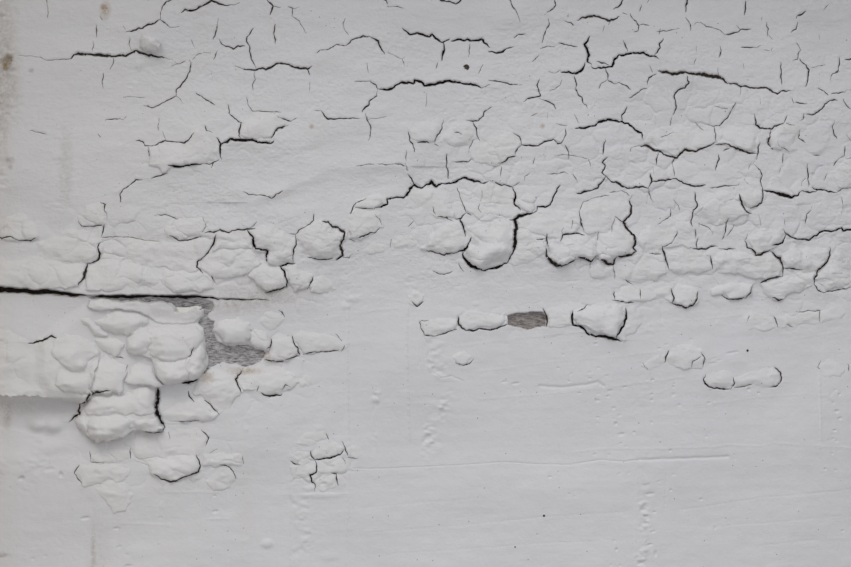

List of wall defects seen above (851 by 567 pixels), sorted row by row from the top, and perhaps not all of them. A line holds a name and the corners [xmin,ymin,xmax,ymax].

crack [0,0,851,341]
peeling [87,297,265,373]
peeling [507,312,546,330]